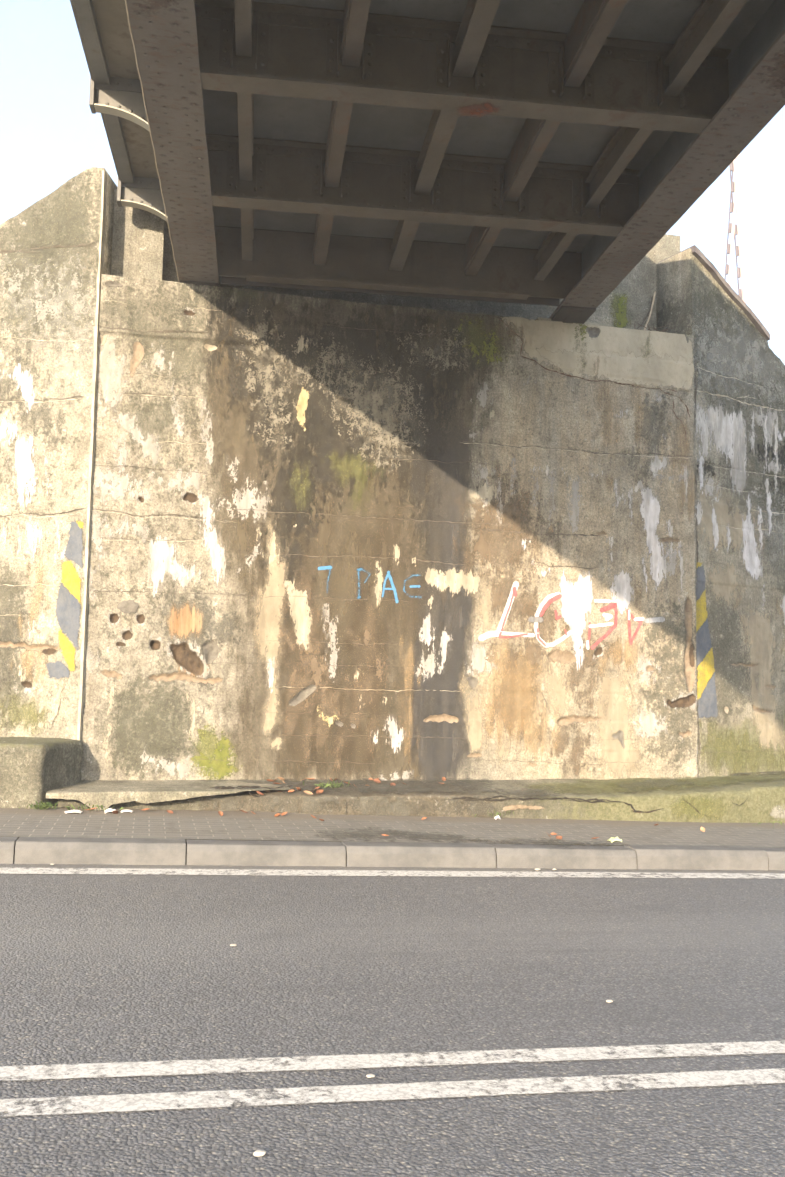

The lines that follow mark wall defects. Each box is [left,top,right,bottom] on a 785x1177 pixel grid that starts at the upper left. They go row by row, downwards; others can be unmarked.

leakage [0,609,38,686]
leakage [0,336,65,564]
spalling [107,600,222,685]
leakage [90,286,695,846]
crack [387,315,785,602]
crack [448,795,748,817]
leakage [606,391,785,750]
crack [697,666,785,767]